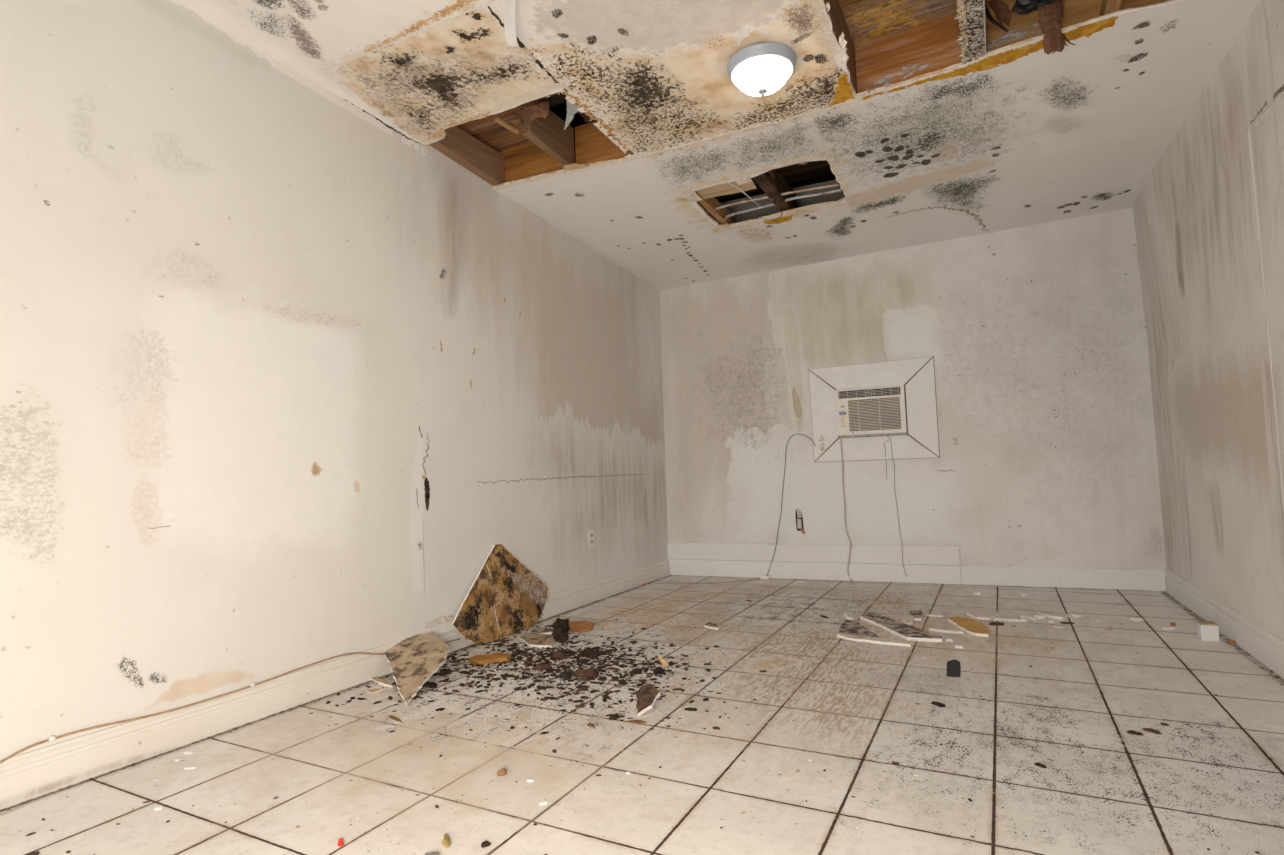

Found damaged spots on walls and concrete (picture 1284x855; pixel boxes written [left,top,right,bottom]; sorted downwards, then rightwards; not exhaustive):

damp [132,0,273,73]
peeling [825,0,1044,106]
peeling [1064,16,1119,42]
crack [1246,84,1284,130]
peeling [764,214,794,224]
damp [228,0,1284,584]
crack [416,426,430,598]
damp [0,549,1214,855]